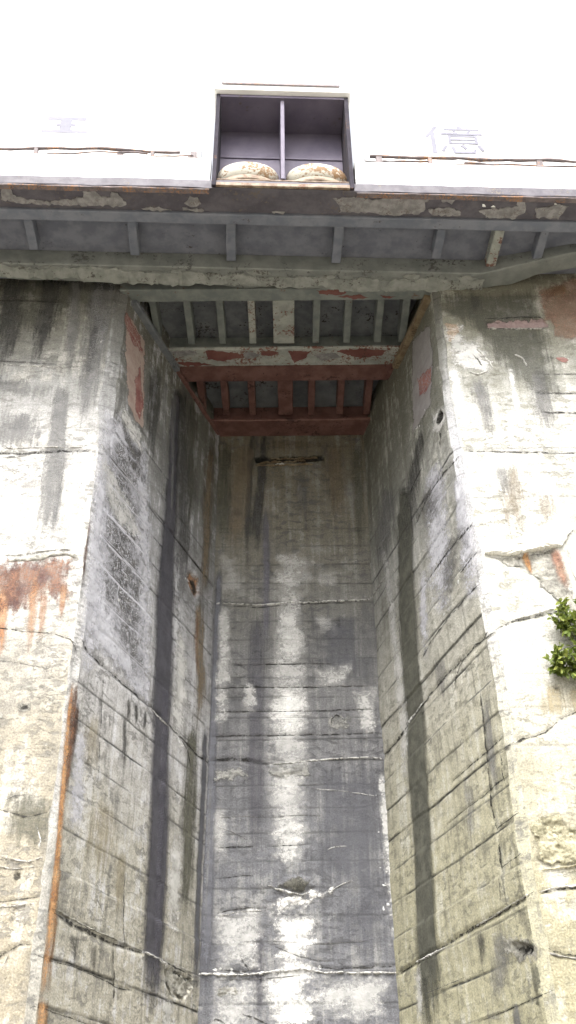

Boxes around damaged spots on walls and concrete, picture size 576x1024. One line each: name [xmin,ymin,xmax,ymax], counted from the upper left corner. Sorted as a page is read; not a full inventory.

peeling [1,189,126,208]
peeling [333,197,461,217]
peeling [478,202,569,220]
damp [0,279,24,360]
damp [33,280,116,413]
peeling [170,348,386,366]
spalling [487,316,548,330]
damp [0,389,68,526]
rust [0,558,70,650]
damp [123,374,478,1024]
rust [43,688,79,985]
rust [38,1002,48,1024]